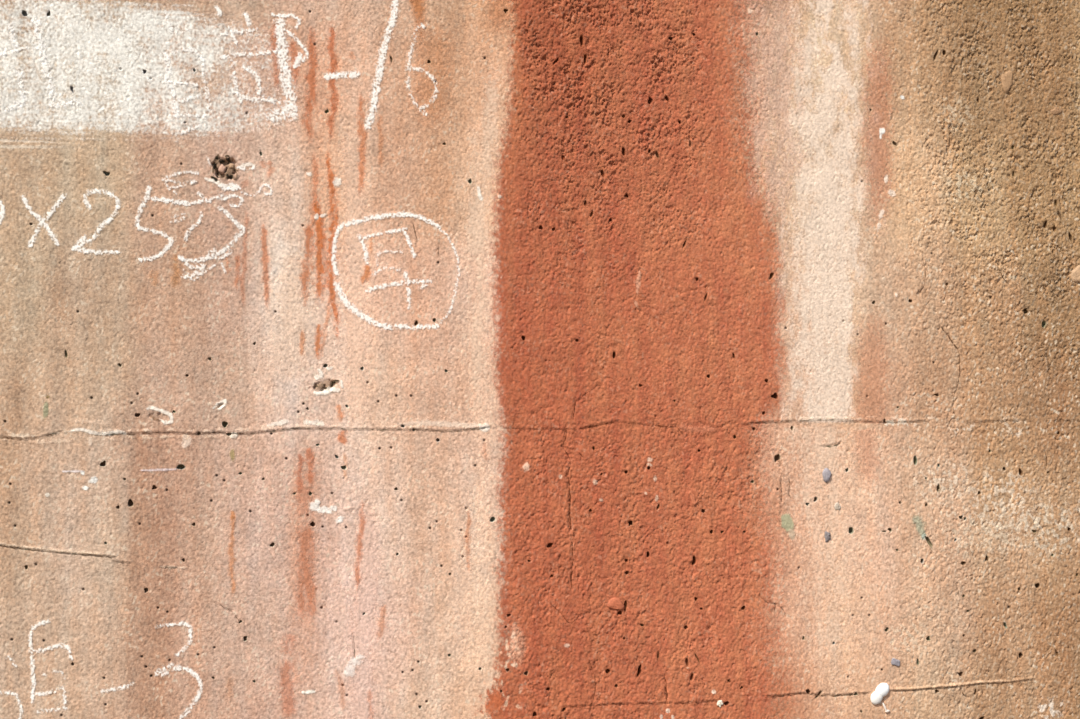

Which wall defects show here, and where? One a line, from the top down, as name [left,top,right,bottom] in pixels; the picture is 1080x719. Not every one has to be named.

corrosion [272,25,317,135]
corrosion [328,28,338,134]
corrosion [358,99,366,185]
corrosion [261,228,269,301]
corrosion [300,158,338,321]
corrosion [300,325,321,355]
corrosion [477,0,794,719]
corrosion [297,448,314,500]
crack [102,383,614,587]
corrosion [299,528,315,611]
corrosion [355,517,365,585]